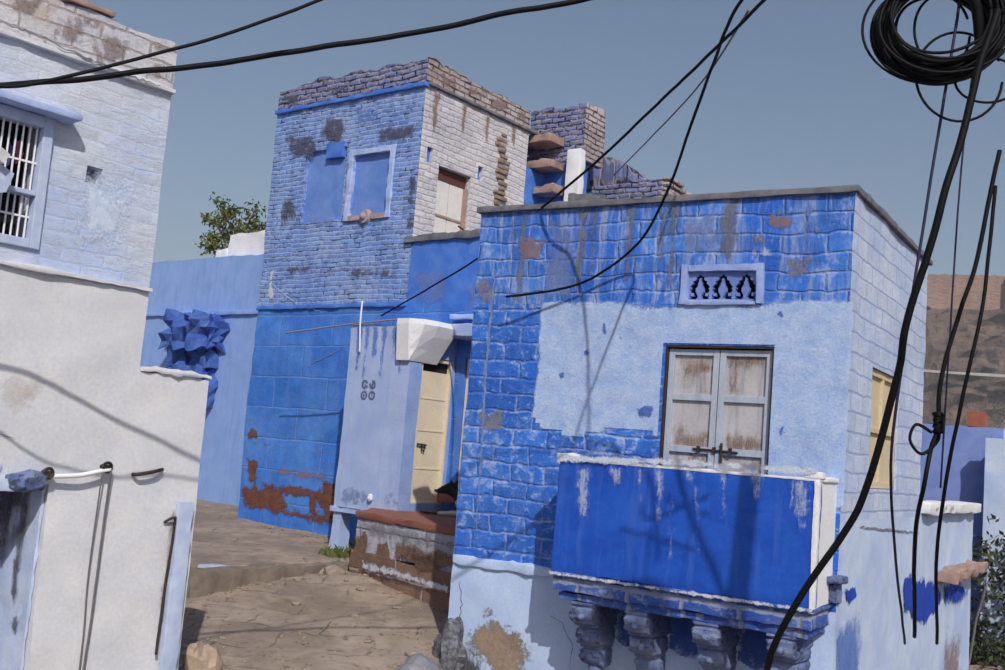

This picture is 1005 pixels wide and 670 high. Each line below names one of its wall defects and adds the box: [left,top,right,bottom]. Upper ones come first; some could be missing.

flaking render [493,133,510,205]
water stain [355,325,401,375]
peeling [637,406,653,417]
spalling [242,459,335,525]
water stain [0,491,27,599]
peeling [354,531,453,574]